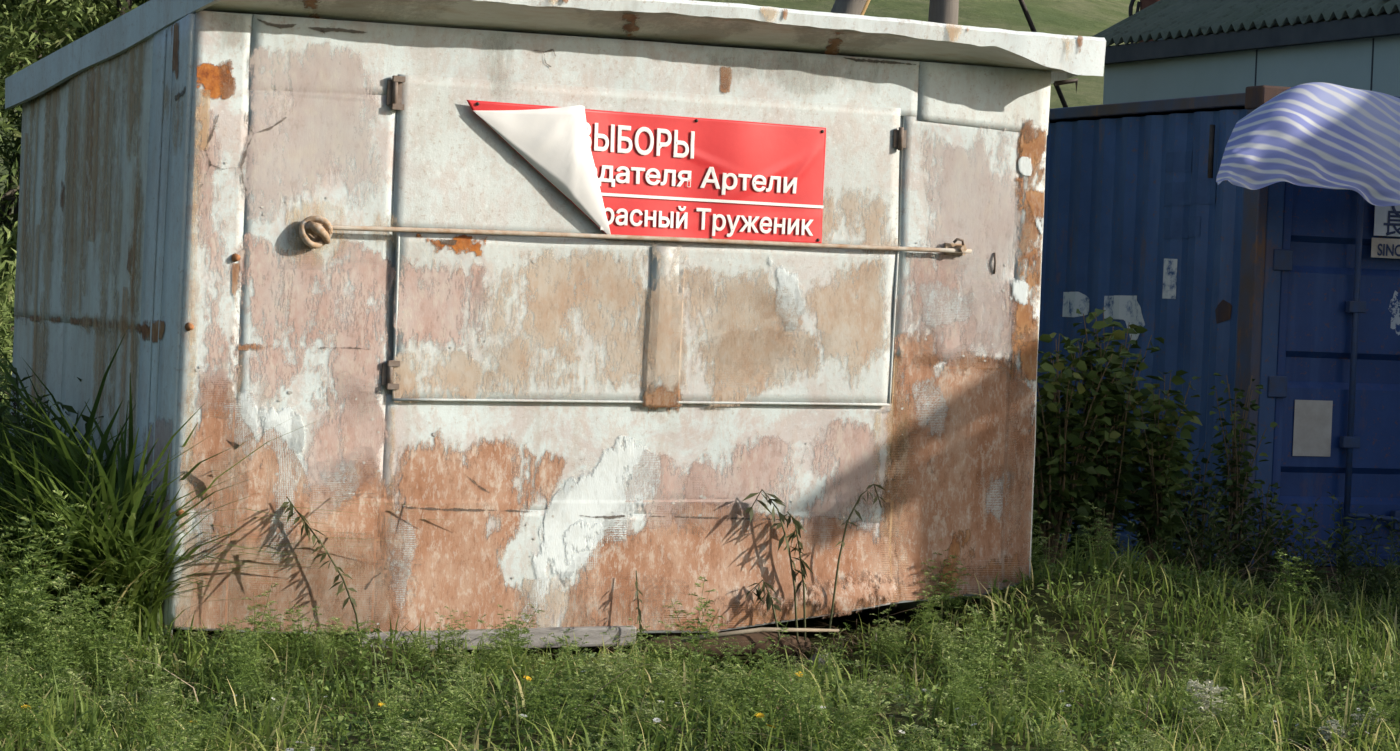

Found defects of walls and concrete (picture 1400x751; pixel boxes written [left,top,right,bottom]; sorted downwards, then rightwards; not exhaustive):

rust [17,75,165,458]
rust [164,23,235,240]
rust [392,349,496,414]
rust [416,233,486,256]
peeling [142,43,1036,633]
rust [520,119,1047,631]